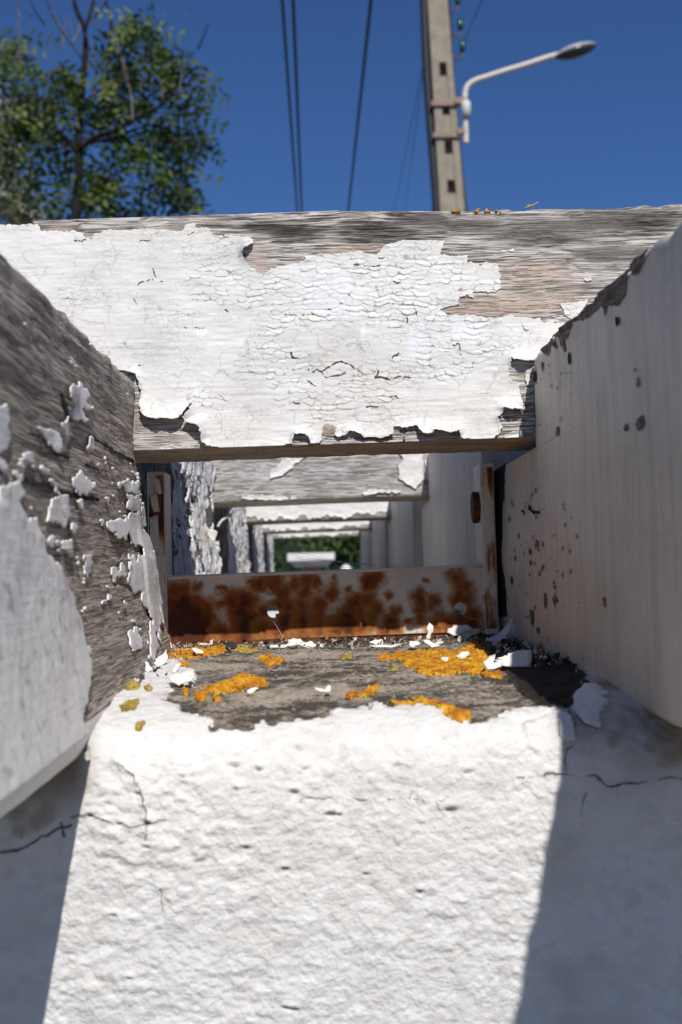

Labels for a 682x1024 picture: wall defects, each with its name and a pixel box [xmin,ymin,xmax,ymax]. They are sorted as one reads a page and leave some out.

peeling [33,211,682,438]
peeling [134,374,202,451]
peeling [288,425,469,446]
rust [148,475,165,555]
peeling [150,477,170,572]
rust [165,567,497,642]
spalling [145,503,571,732]
crack [0,763,166,854]
crack [518,710,681,824]